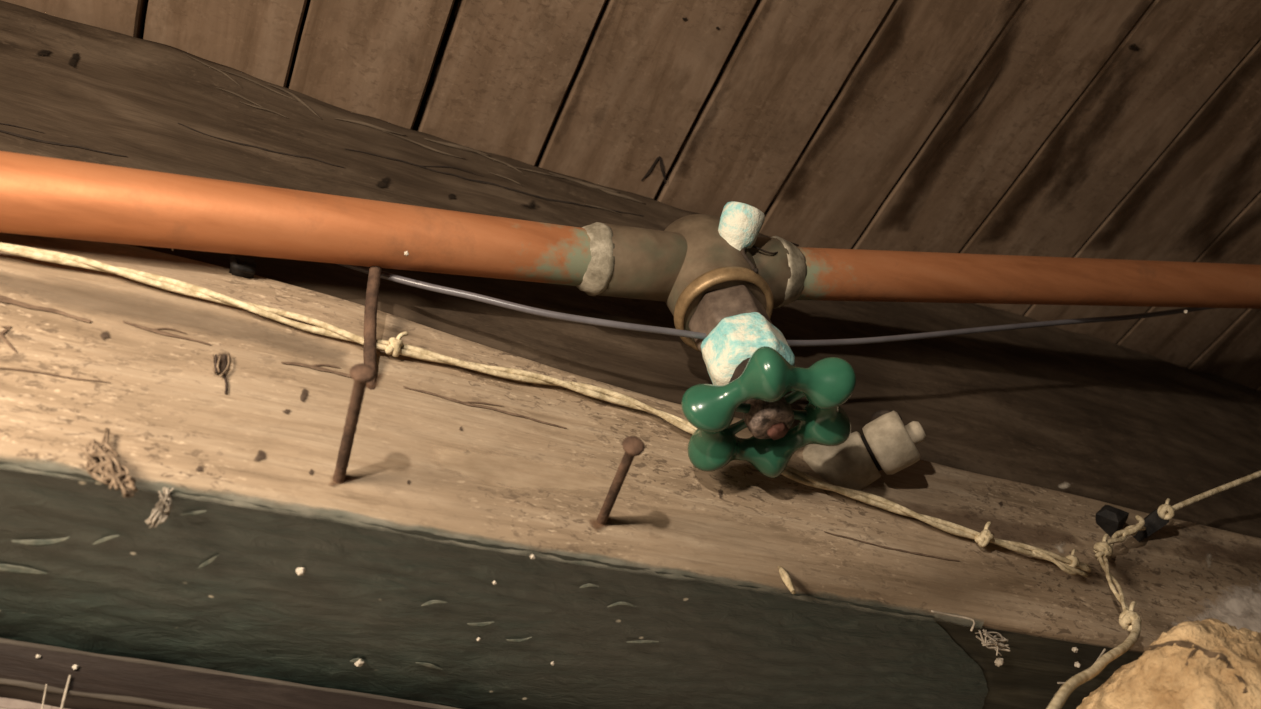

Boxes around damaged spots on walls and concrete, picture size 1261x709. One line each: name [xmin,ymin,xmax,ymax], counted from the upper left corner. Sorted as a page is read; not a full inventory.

damp [783,9,906,196]
damp [885,0,1025,226]
damp [984,47,1129,239]
damp [1095,51,1261,259]